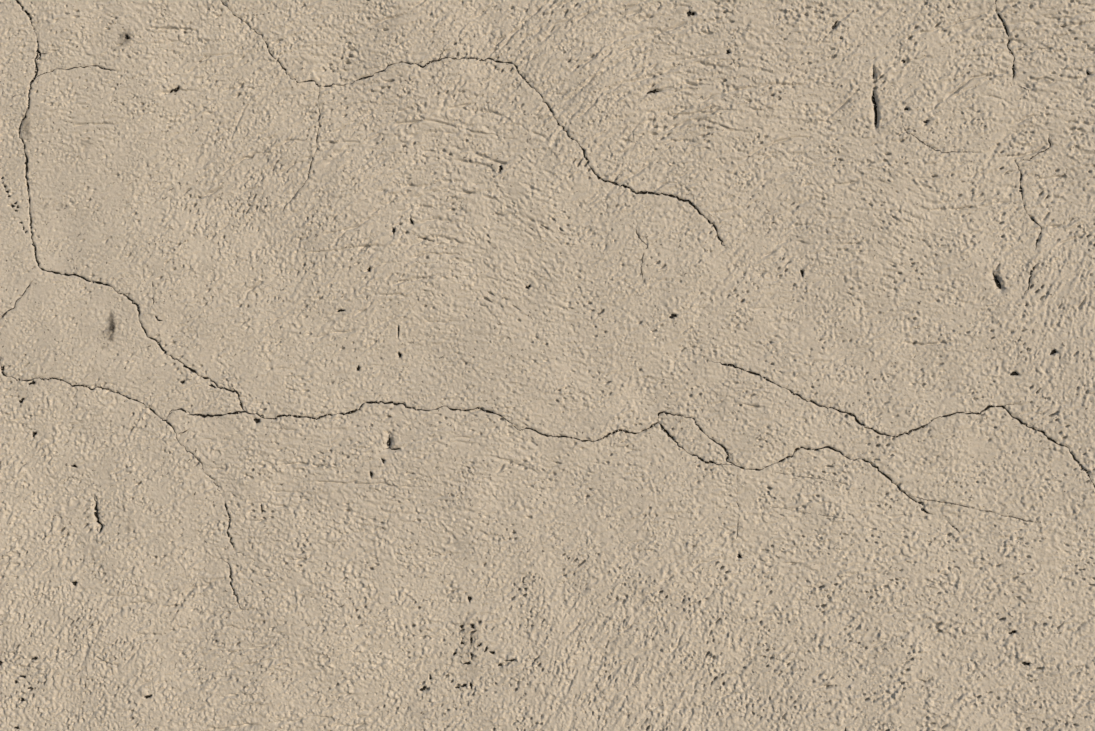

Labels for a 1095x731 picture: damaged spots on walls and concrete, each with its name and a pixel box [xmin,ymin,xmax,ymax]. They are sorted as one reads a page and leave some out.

crack [1015,138,1051,295]
crack [0,0,1036,611]
crack [712,361,1095,488]